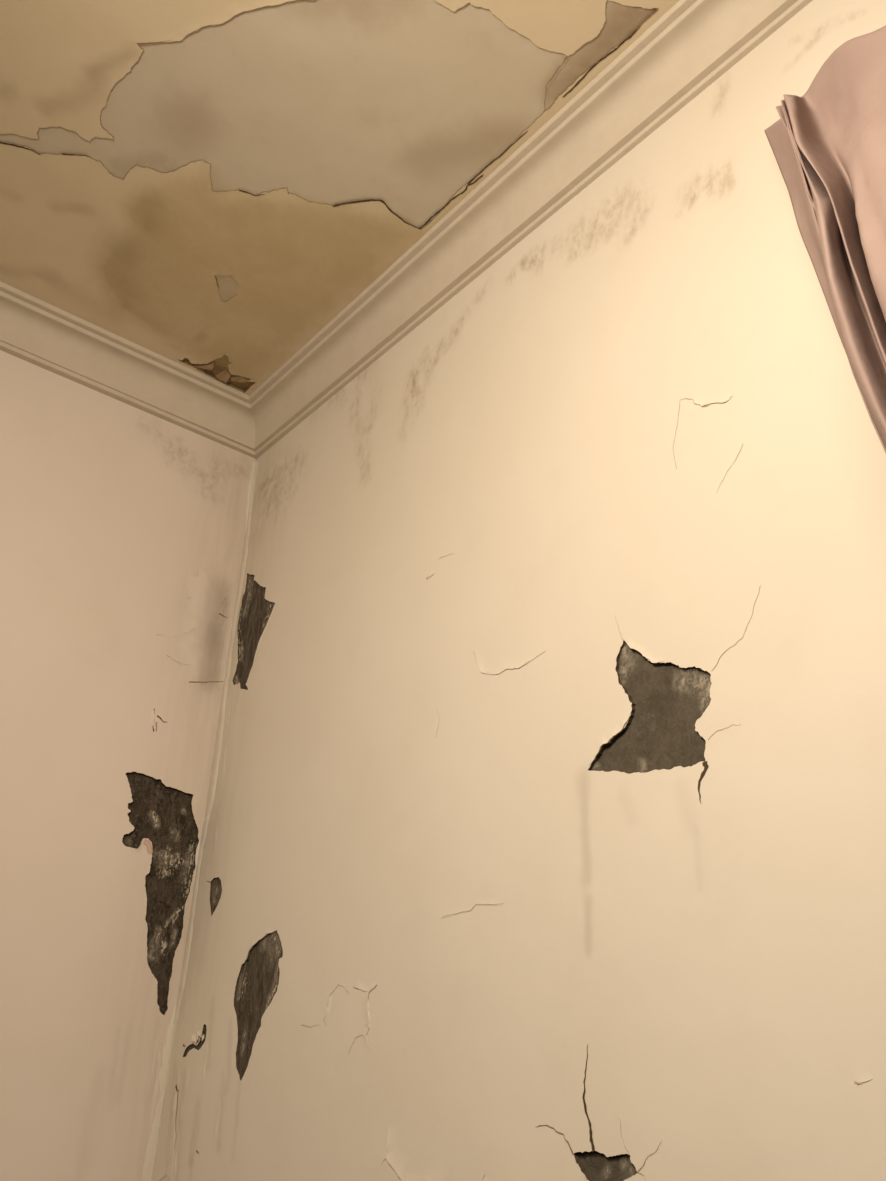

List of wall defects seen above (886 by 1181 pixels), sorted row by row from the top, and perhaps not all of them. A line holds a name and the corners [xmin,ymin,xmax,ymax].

peeling [0,0,658,229]
peeling [177,355,256,393]
peeling [219,573,277,690]
peeling [581,587,760,803]
peeling [122,772,199,1015]
peeling [208,877,222,917]
peeling [234,923,283,1081]
peeling [537,1045,661,1181]